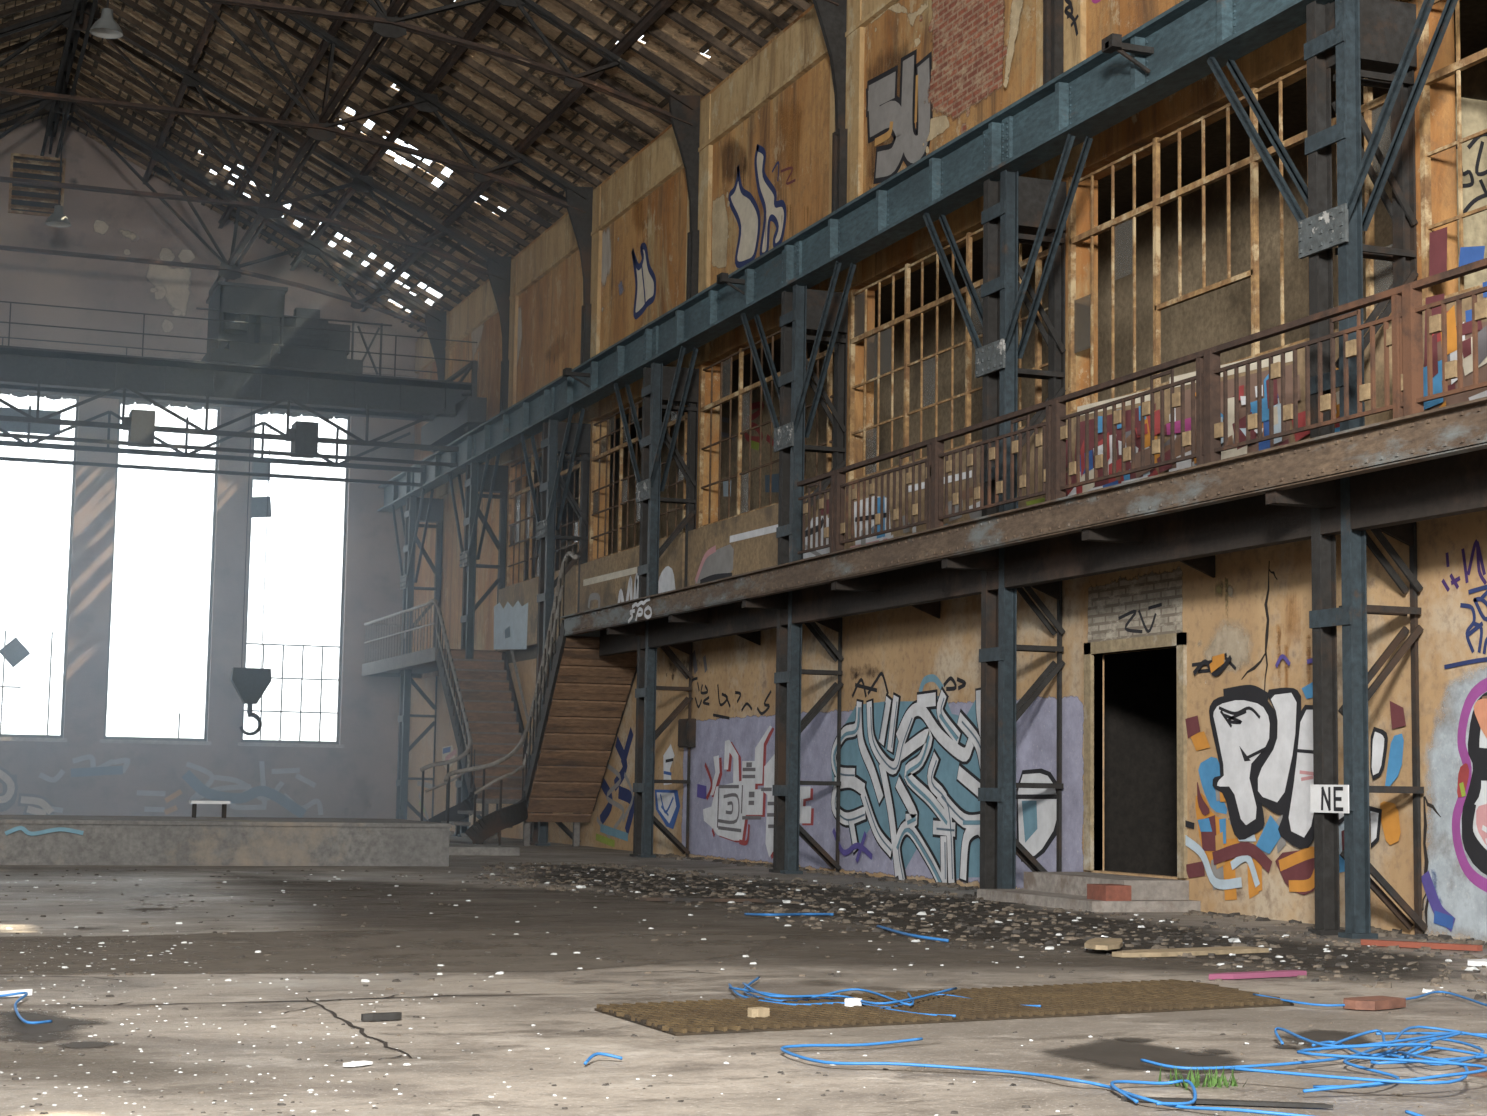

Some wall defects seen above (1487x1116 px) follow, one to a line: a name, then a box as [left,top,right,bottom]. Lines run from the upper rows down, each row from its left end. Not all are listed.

crack [115,994,484,1060]